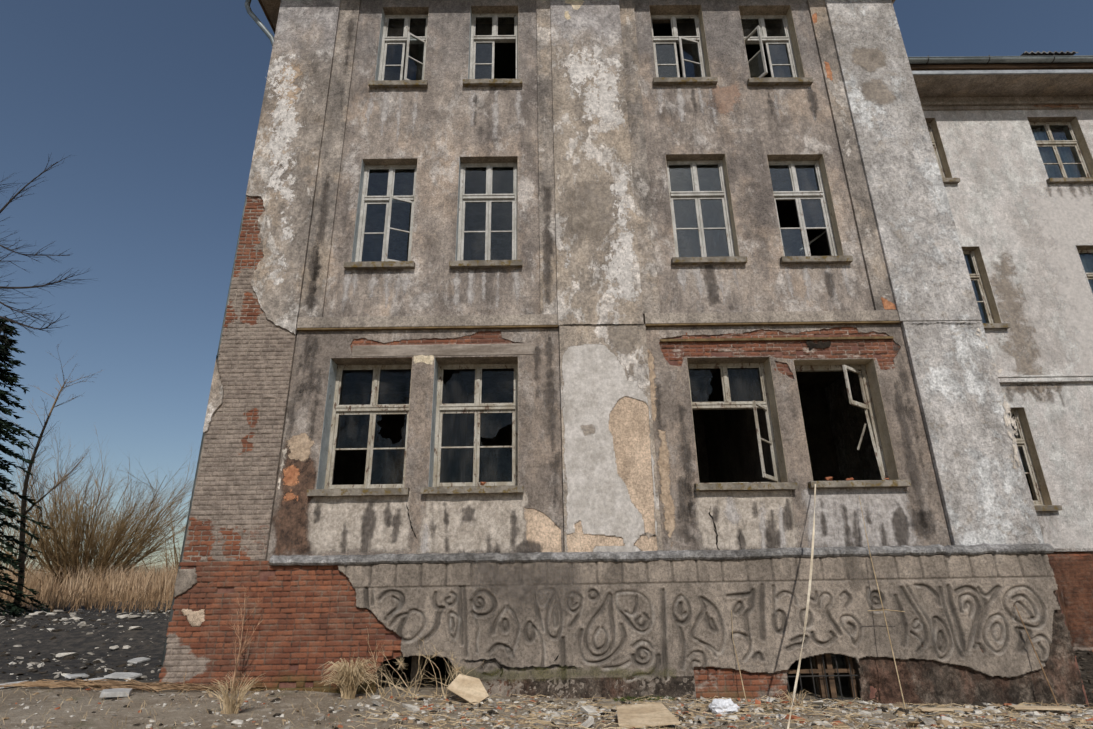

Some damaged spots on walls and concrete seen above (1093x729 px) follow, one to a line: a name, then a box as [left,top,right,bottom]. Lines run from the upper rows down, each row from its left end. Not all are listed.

damp [543,186,553,303]
damp [564,183,620,241]
flaking render [159,40,403,694]
damp [272,339,541,580]
damp [534,337,560,472]
flaking render [524,325,900,552]
damp [678,368,935,550]
crack [463,654,583,677]
flaking render [693,667,788,700]